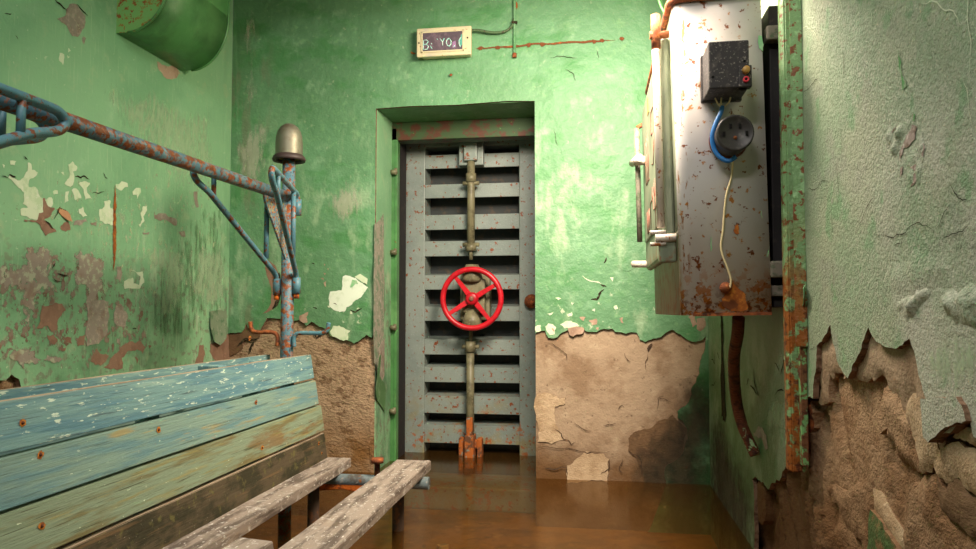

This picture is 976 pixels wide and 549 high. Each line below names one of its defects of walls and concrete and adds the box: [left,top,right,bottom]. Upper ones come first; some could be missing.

corrosion [477,37,624,50]
flaking render [0,377,15,390]
peeling [0,160,214,374]
flaking render [195,260,281,363]
flaking render [291,489,353,516]
flaking render [293,213,386,475]
flaking render [534,297,706,531]
leakage [642,388,749,542]
corrosion [808,399,825,456]
flaking render [757,335,976,549]